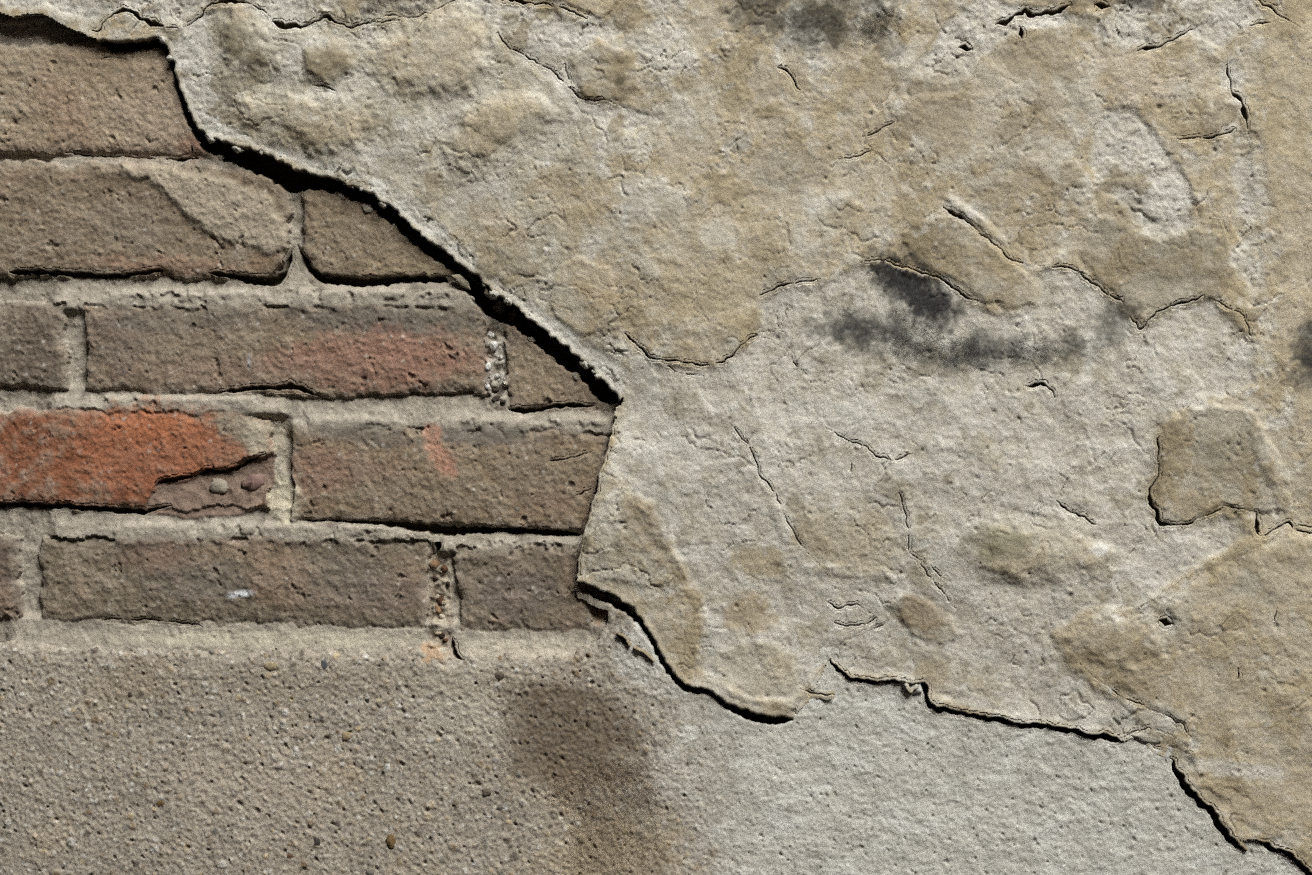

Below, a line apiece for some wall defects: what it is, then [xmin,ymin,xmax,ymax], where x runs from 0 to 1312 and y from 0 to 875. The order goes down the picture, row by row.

peeling [1,0,217,25]
peeling [239,0,356,34]
crack [992,2,1074,41]
crack [1136,0,1312,142]
crack [856,256,983,304]
crack [925,201,1256,340]
leakage [830,314,918,349]
leakage [932,331,1026,368]
spalling [144,451,277,521]
crack [824,426,958,611]
crack [1145,432,1312,539]
crack [798,659,1312,875]